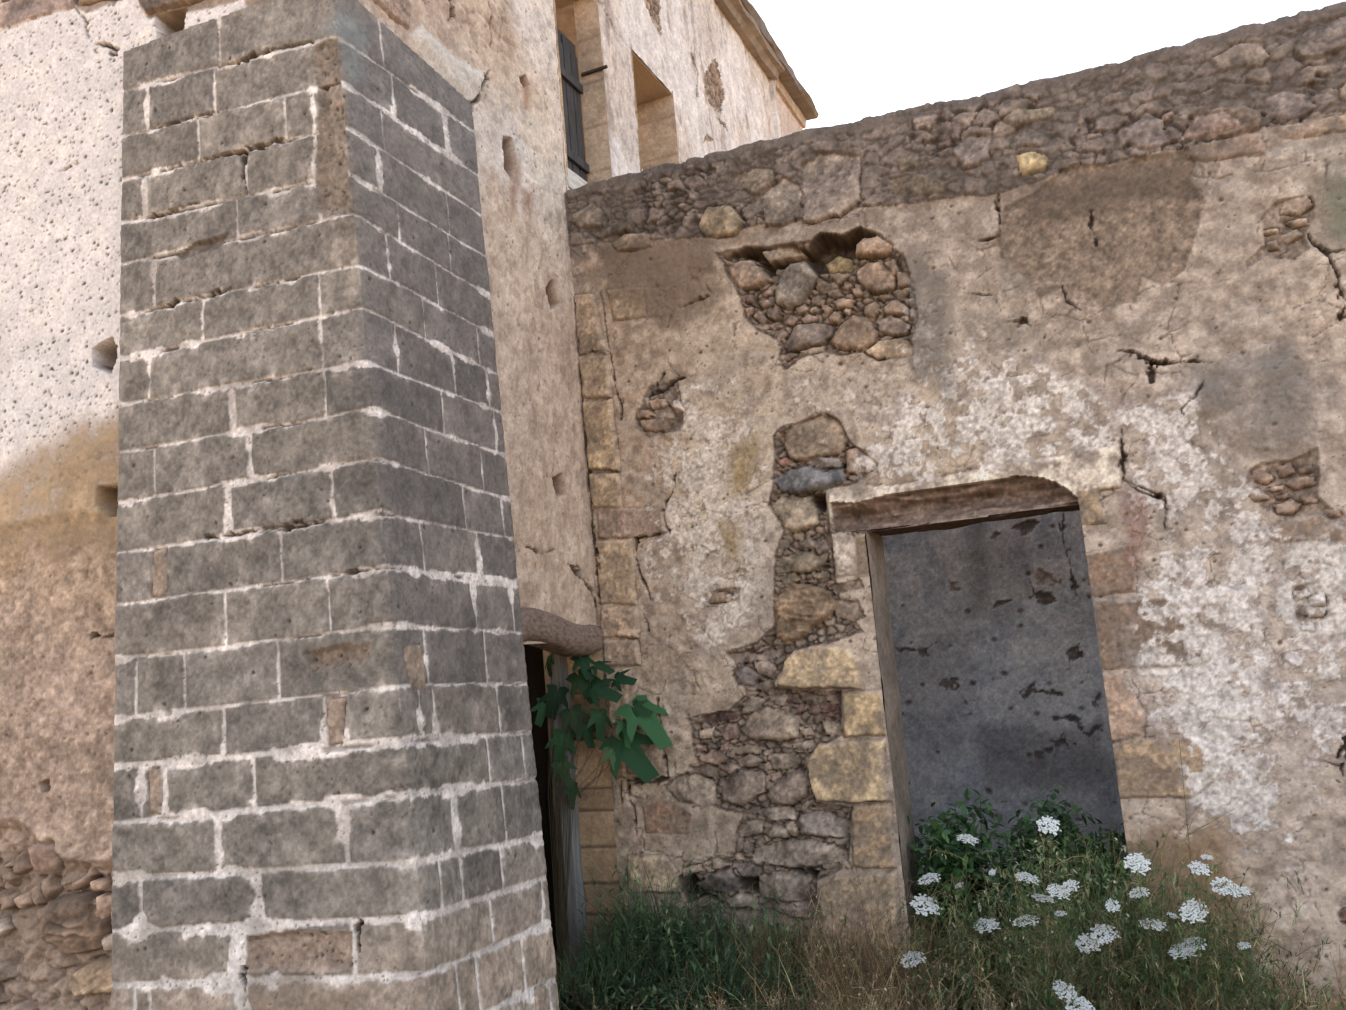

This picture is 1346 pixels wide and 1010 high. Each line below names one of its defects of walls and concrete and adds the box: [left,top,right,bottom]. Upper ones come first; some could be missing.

spalling [1245,194,1317,270]
crack [1304,229,1346,323]
crack [1116,348,1214,420]
crack [1116,427,1169,533]
spalling [633,225,1346,952]
flaking render [0,483,118,1010]